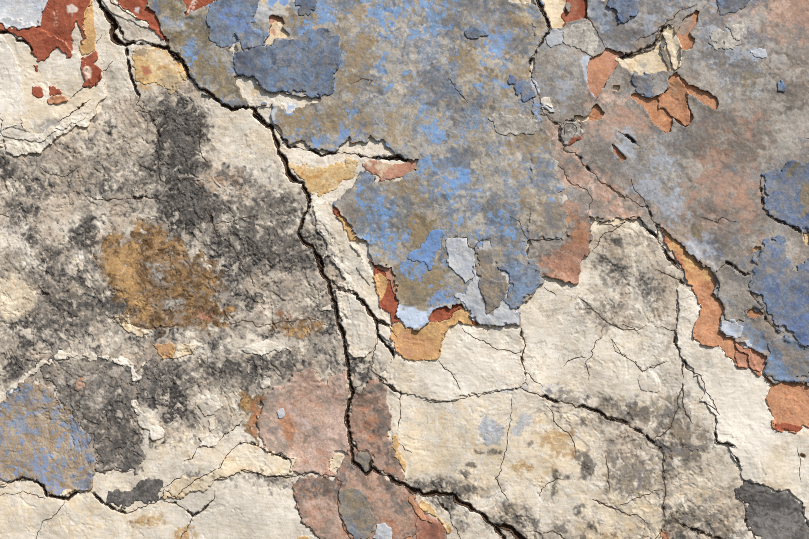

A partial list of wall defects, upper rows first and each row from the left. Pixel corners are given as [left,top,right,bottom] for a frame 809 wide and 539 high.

peeling [0,0,107,156]
damp [160,108,202,162]
crack [0,0,565,539]
peeling [101,0,809,402]
crack [425,0,742,539]
crack [716,262,784,333]
peeling [0,378,99,498]
damp [0,350,169,475]
peeling [161,368,452,539]
peeling [675,285,809,525]